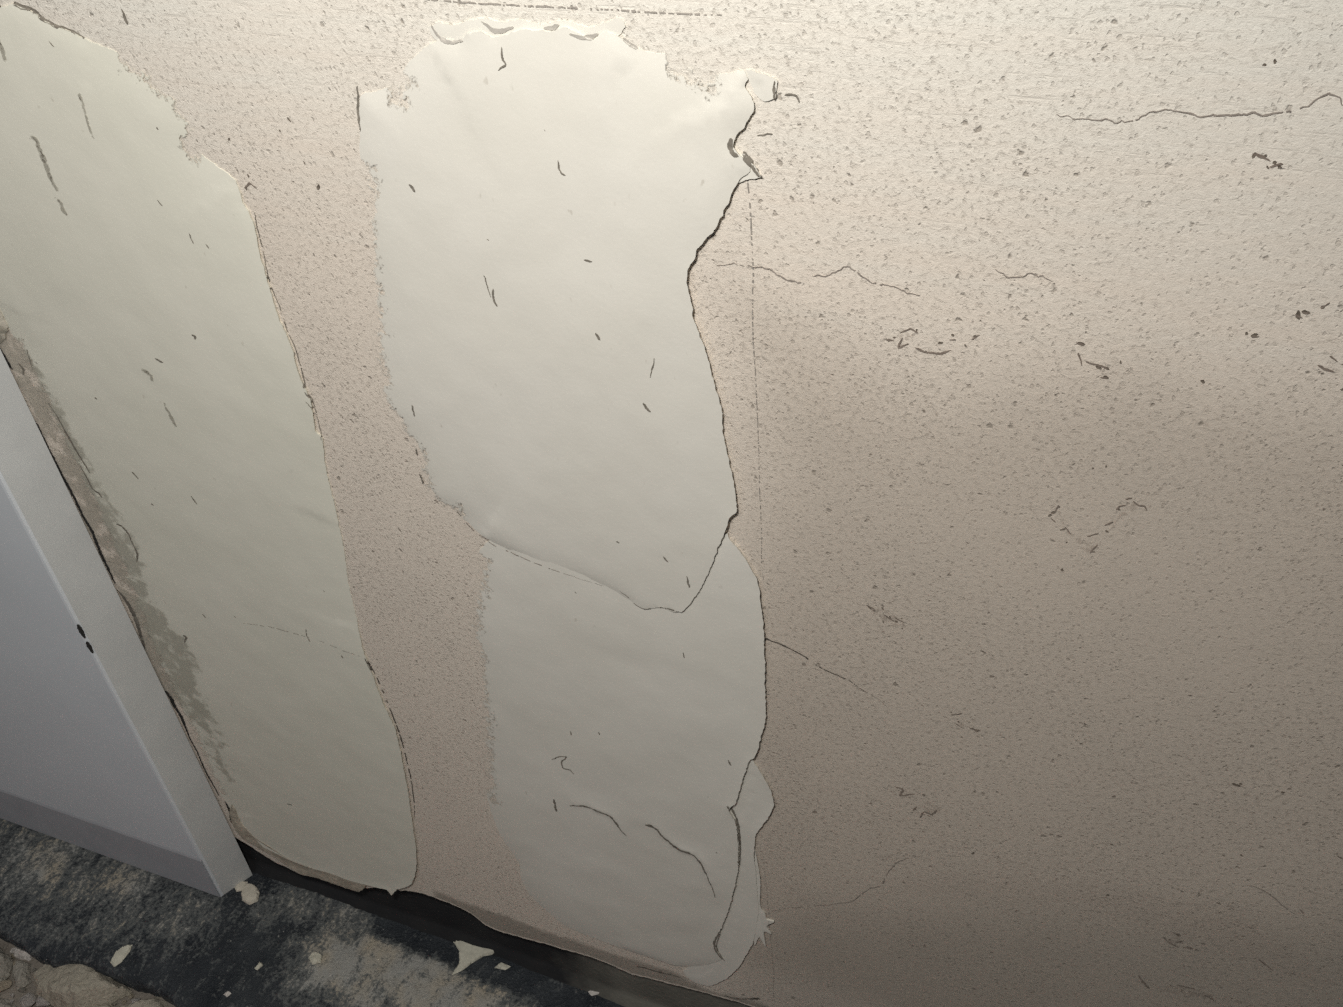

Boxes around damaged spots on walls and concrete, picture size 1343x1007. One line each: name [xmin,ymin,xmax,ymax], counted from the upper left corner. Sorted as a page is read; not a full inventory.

flaking render [0,4,417,895]
flaking render [359,27,778,986]
crack [1056,92,1343,124]